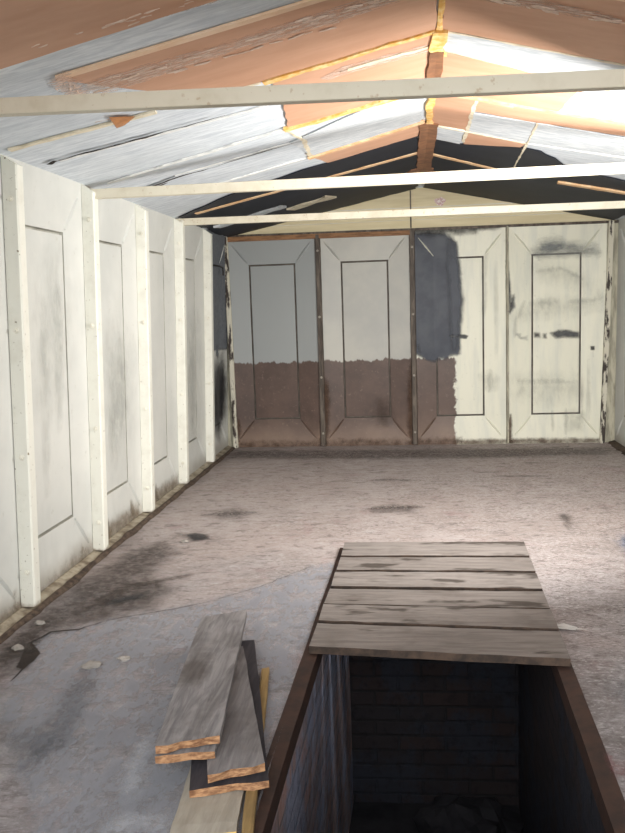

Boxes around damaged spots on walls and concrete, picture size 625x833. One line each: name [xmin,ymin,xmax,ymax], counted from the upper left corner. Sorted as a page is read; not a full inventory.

peeling [51,0,397,95]